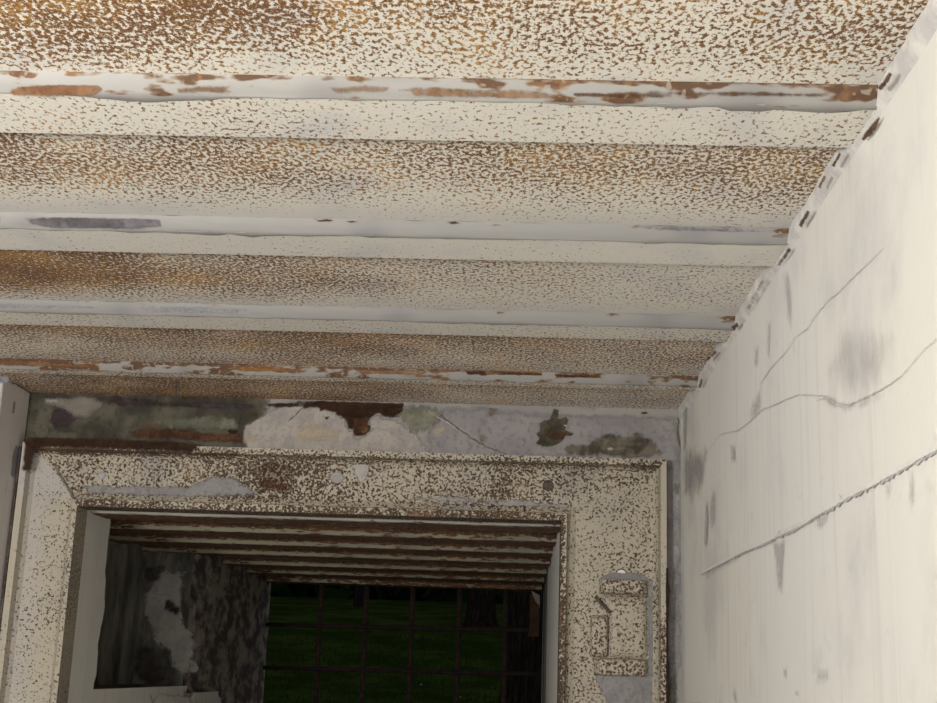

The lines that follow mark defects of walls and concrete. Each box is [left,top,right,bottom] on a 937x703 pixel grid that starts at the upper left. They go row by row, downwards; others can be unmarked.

corrosion [11,85,101,96]
corrosion [411,87,663,98]
corrosion [862,117,880,140]
corrosion [0,359,96,368]
crack [705,248,937,454]
corrosion [268,401,404,436]
spalling [243,405,680,468]
peeling [84,477,256,497]
peeling [352,465,369,483]
crack [701,444,937,575]
peeling [135,566,198,681]
peeling [596,572,653,703]